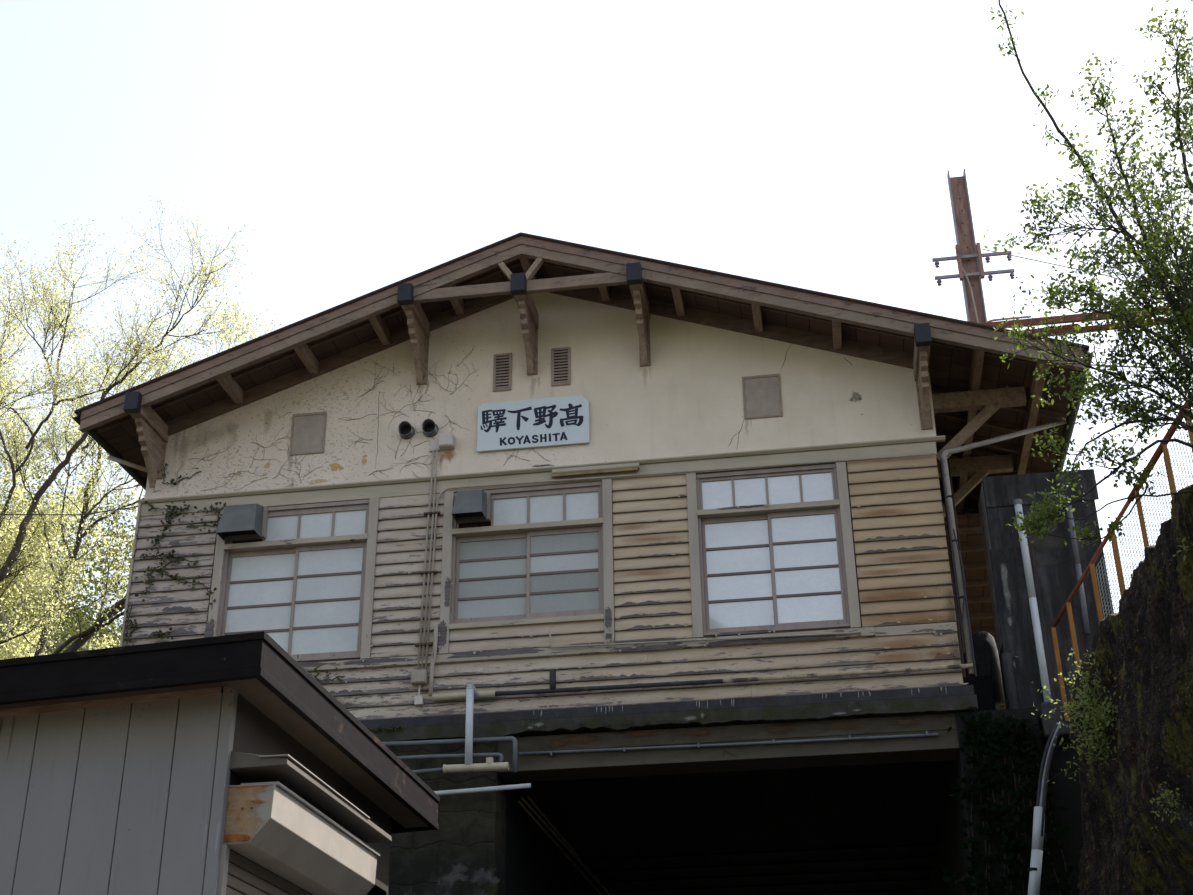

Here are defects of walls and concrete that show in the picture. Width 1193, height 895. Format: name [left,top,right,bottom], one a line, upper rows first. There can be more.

peeling [628,541,688,568]
peeling [856,533,947,554]
peeling [131,606,217,639]
peeling [298,570,737,708]
peeling [699,619,957,660]
rust [223,784,273,843]